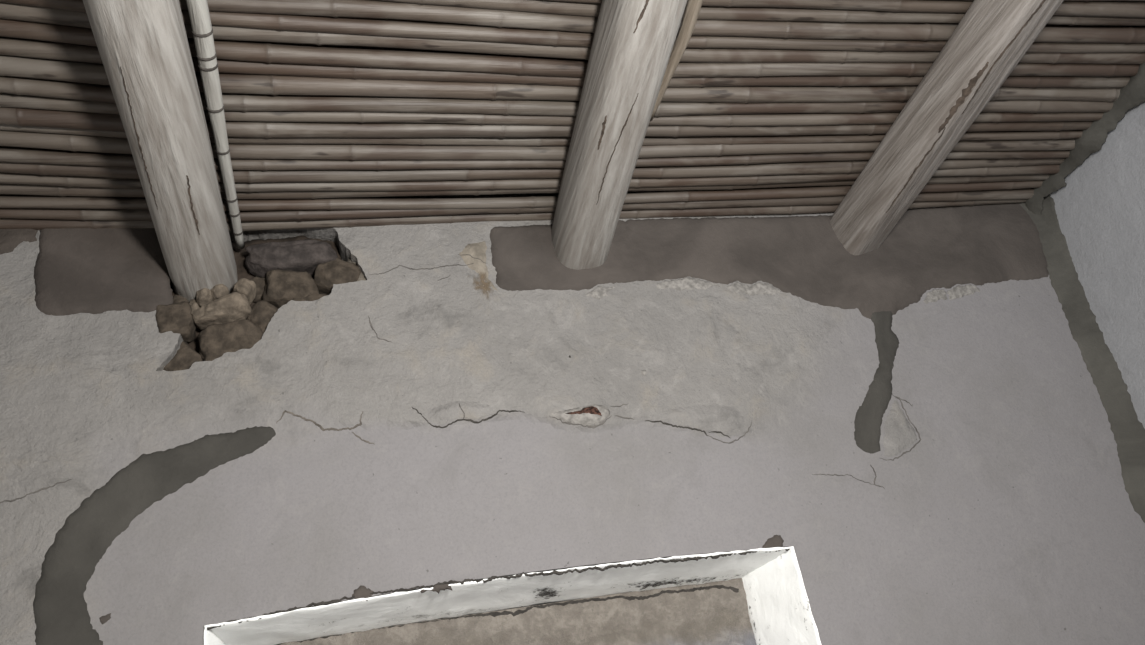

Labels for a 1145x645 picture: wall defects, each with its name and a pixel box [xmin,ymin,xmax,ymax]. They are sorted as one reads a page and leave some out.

spalling [155,235,366,371]
crack [276,410,375,445]
crack [412,404,525,428]
crack [553,404,752,444]